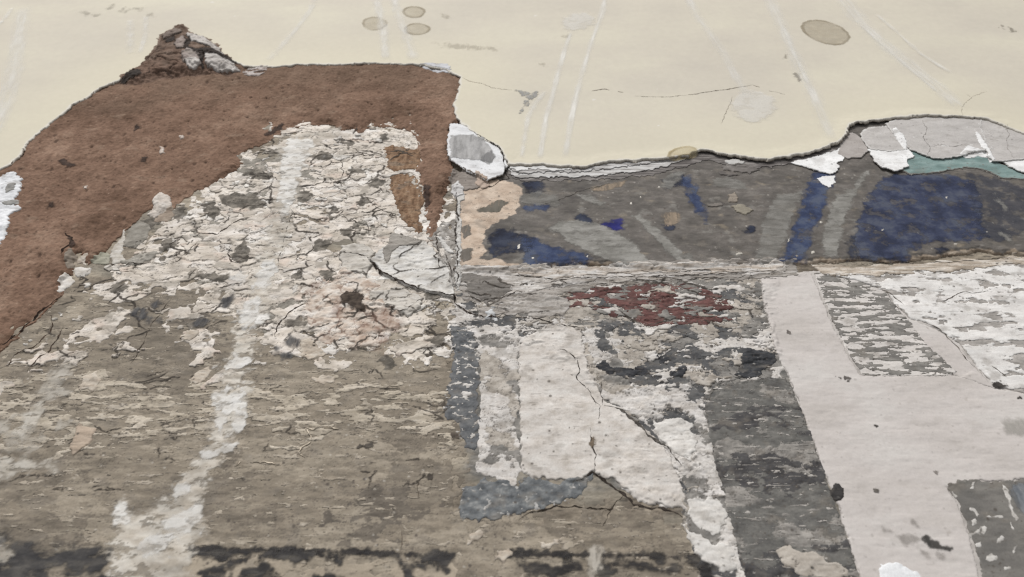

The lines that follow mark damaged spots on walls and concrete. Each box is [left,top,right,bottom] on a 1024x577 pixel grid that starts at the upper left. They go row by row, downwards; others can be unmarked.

water stain [801,20,849,45]
crack [0,128,778,525]
flaking render [0,63,859,577]
peeling [446,117,1024,393]
peeling [947,478,1024,577]